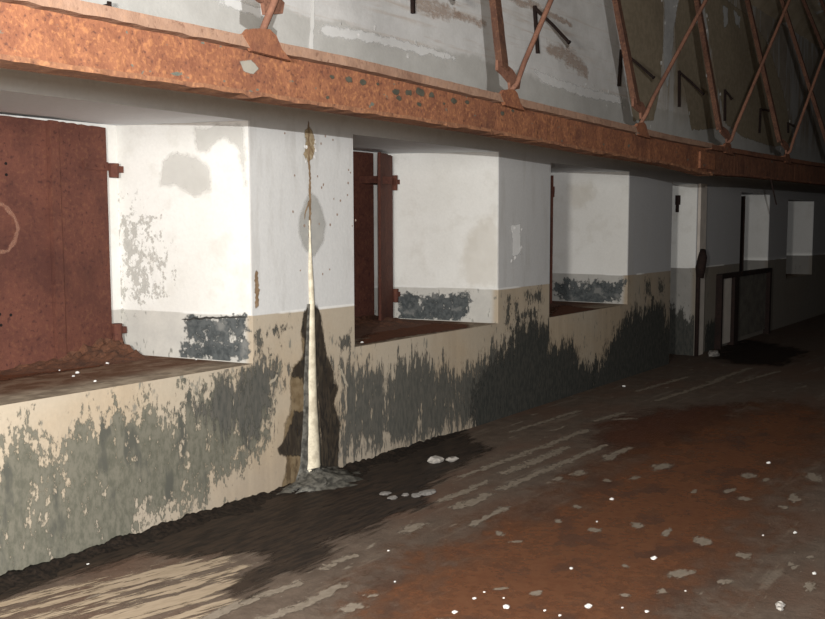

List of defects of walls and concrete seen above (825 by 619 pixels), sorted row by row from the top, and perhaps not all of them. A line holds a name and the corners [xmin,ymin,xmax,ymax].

peeling [534,0,792,150]
leakage [0,195,694,619]
leakage [654,319,808,401]